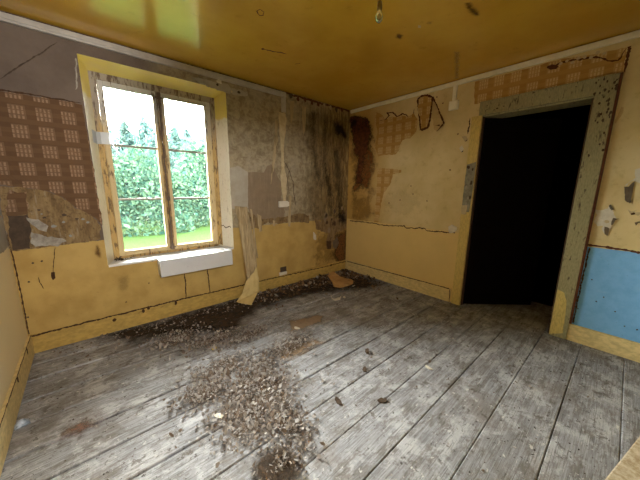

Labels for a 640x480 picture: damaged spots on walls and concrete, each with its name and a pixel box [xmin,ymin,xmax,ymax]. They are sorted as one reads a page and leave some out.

crack [0,11,349,112]
spalling [0,186,101,254]
spalling [248,165,347,249]
leakage [334,116,375,192]
crack [350,220,455,233]
peeling [461,162,476,214]
peeling [594,205,617,236]
peeling [624,168,640,225]
crack [0,234,450,427]